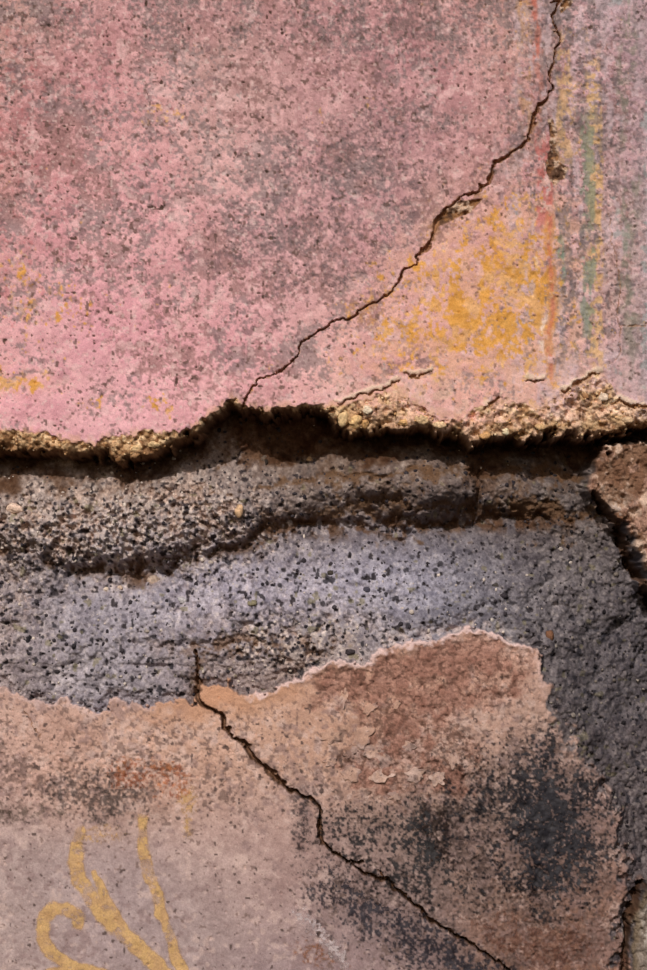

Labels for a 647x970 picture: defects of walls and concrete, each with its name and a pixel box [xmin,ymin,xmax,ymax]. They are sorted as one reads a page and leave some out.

crack [243,0,564,404]
spalling [0,371,647,970]
crack [193,649,511,970]